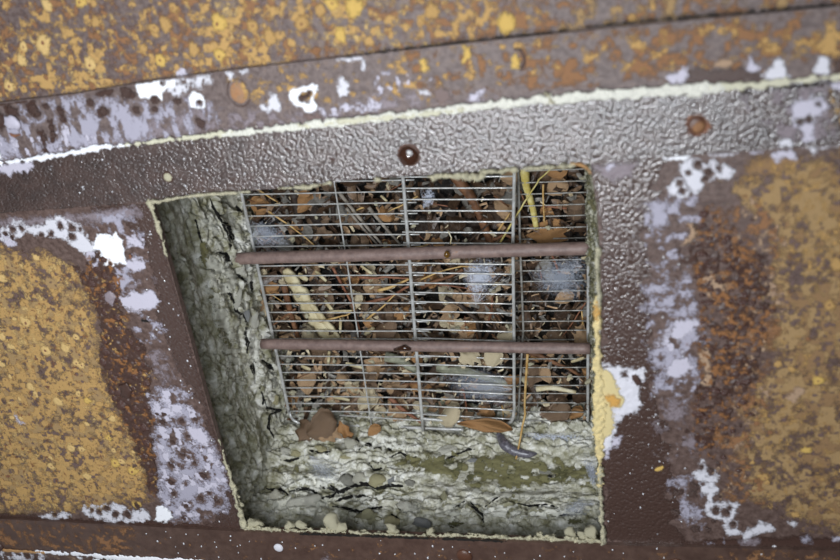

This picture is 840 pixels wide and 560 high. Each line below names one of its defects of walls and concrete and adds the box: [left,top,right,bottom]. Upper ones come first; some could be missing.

rust [37,106,67,153]
water stain [0,68,433,177]
rust [0,0,840,132]
water stain [746,56,791,81]
water stain [761,56,840,164]
water stain [639,153,735,454]
water stain [0,205,230,523]
rust [0,204,241,560]
spalling [266,474,344,514]
spalling [353,435,458,458]
spalling [353,484,576,520]
water stain [667,459,776,546]